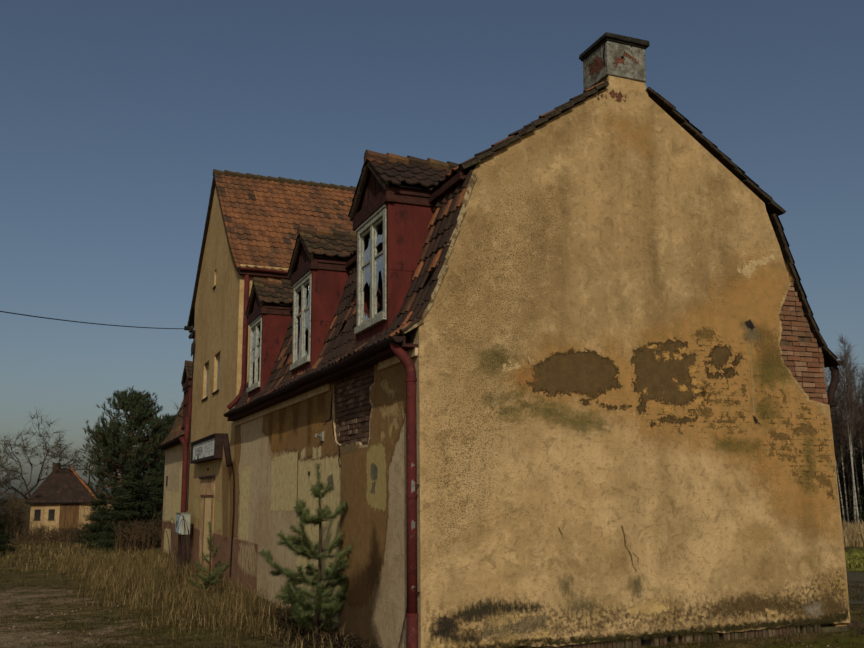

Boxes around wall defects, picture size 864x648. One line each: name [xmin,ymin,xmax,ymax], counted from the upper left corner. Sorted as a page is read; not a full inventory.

flaking render [589,52,639,75]
peeling [519,264,836,530]
peeling [234,425,257,581]
peeling [262,357,414,596]
water stain [431,600,545,645]